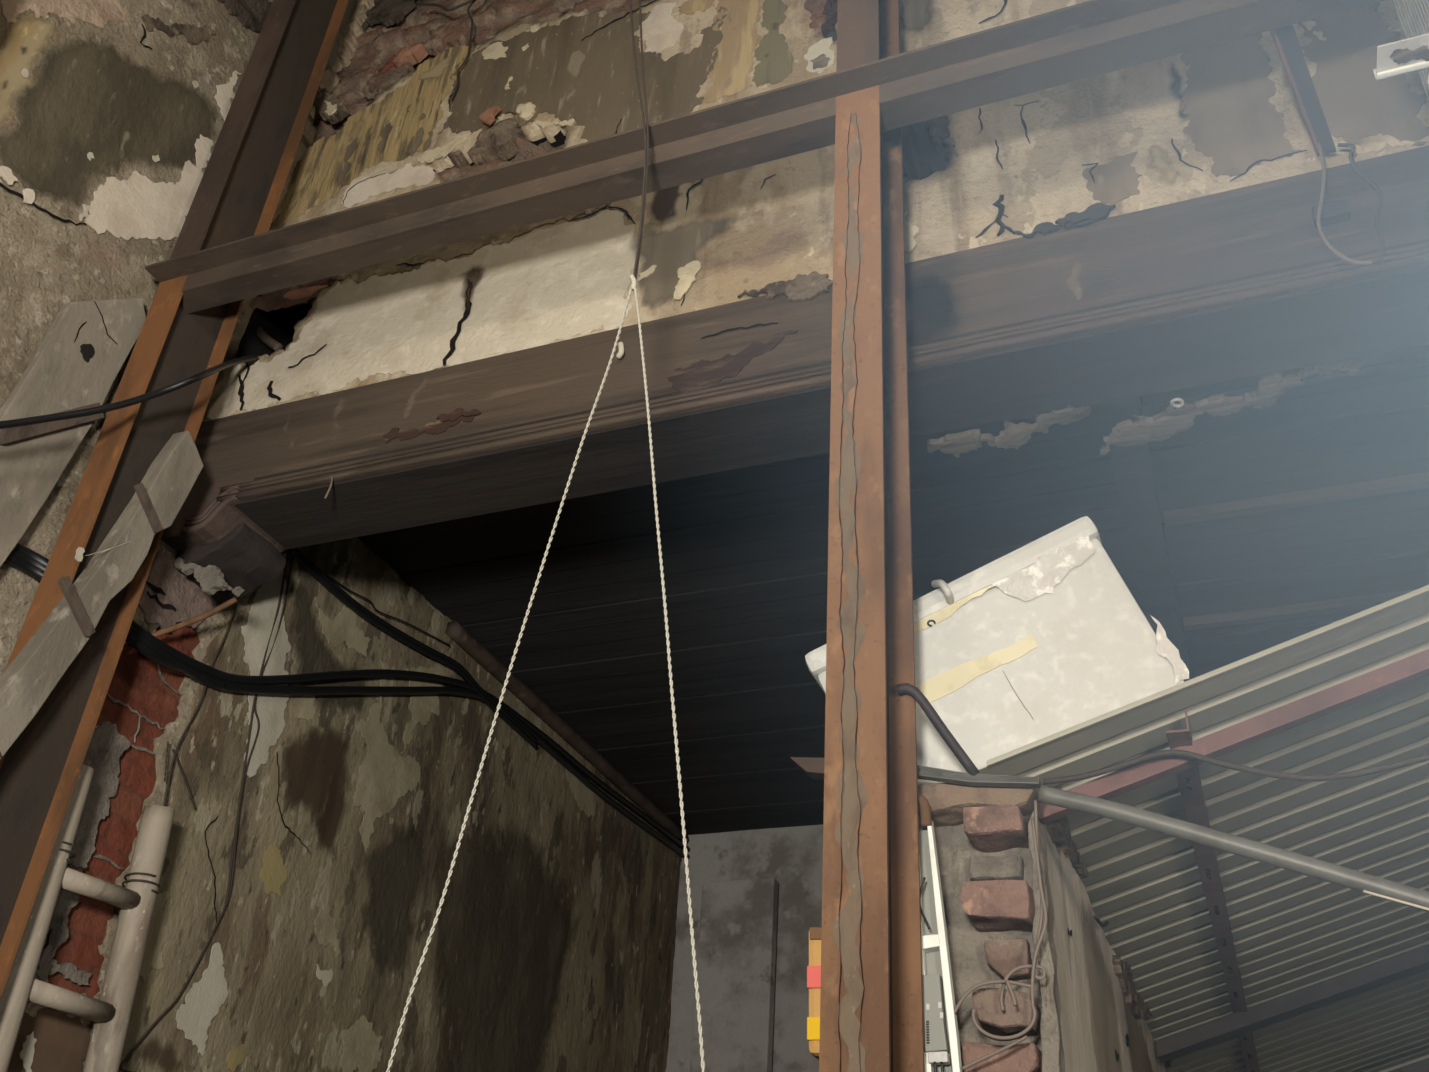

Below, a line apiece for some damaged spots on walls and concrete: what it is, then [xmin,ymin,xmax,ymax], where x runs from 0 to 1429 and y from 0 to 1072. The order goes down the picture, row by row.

crack [0,166,87,225]
damp [0,18,215,205]
spalling [417,102,575,182]
flaking render [314,0,715,140]
crack [975,101,1039,238]
crack [443,279,473,365]
damp [296,590,365,710]
corrosion [838,115,865,1072]
flaking render [82,648,185,884]
damp [286,729,347,848]
peeling [176,942,228,1056]
damp [364,827,571,1072]